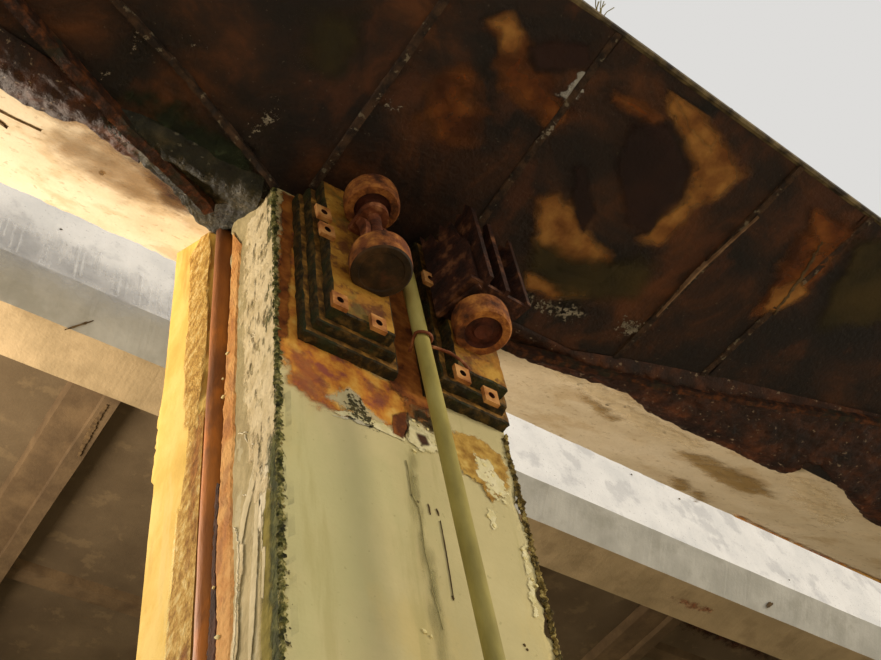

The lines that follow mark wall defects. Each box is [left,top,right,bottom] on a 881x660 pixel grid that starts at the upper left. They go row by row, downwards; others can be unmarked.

crack [0,110,42,132]
water stain [60,120,190,214]
rust [491,14,592,127]
rust [277,191,434,432]
rust [526,273,586,321]
rust [165,228,233,660]
spalling [324,389,438,454]
peeling [452,431,563,660]
water stain [555,371,769,498]
water stain [672,479,703,502]